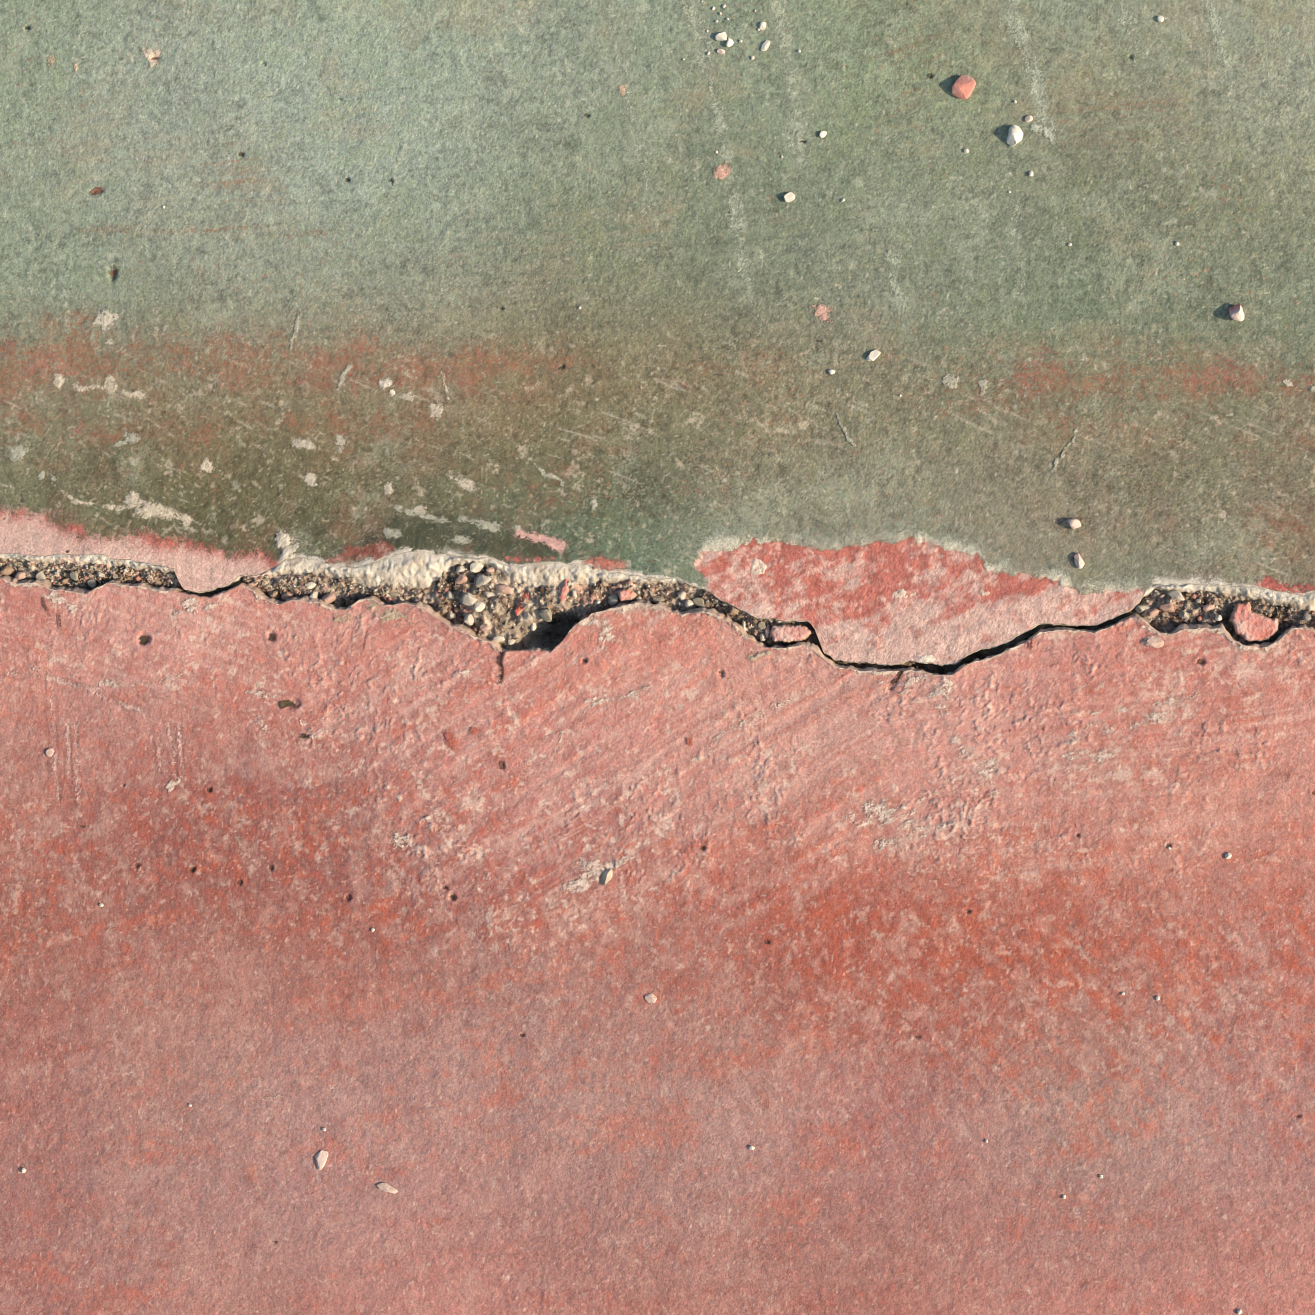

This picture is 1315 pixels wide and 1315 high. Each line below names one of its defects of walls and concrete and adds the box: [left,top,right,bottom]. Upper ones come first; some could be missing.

crack [186,576,245,596]
peeling [0,495,1315,677]
crack [42,597,62,630]
crack [779,604,1139,690]
crack [496,651,504,684]